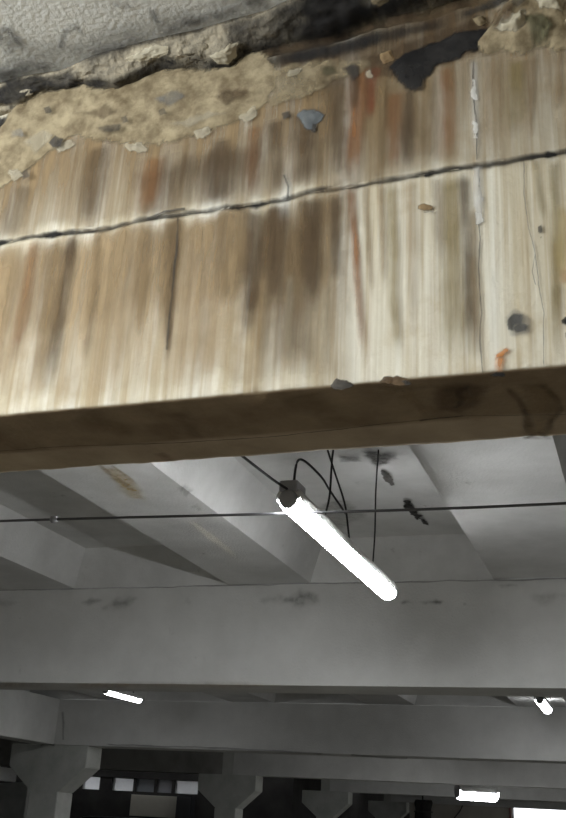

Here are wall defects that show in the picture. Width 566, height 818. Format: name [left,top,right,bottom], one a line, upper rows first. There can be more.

leakage [0,44,175,104]
peeling [0,0,566,188]
leakage [208,0,504,125]
leakage [0,76,345,221]
crack [0,63,566,245]
leakage [448,169,483,224]
rust [65,240,74,266]
leakage [22,192,340,348]
rust [352,217,360,316]
rust [496,348,508,369]
leakage [342,452,394,486]
leakage [403,500,428,525]